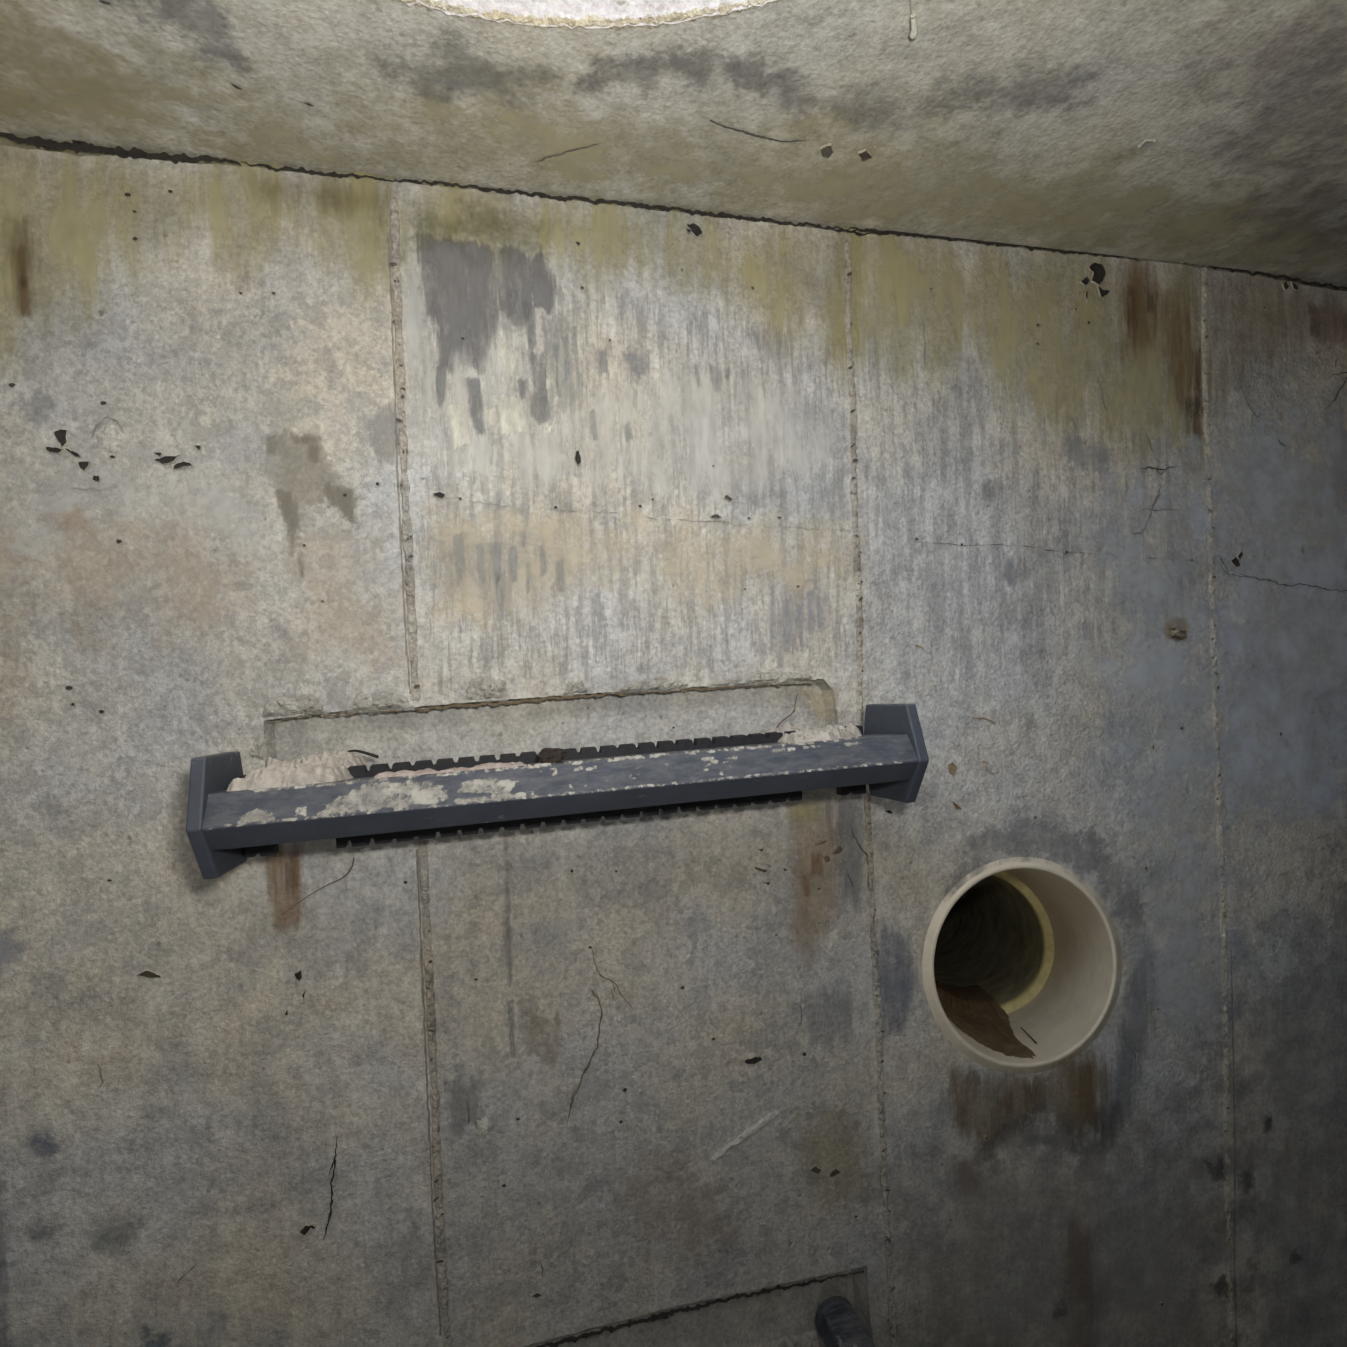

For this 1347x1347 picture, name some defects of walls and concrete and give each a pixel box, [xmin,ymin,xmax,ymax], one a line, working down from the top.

crack [0,132,1138,261]
crack [1176,262,1347,290]
leakage [418,235,553,434]
crack [1326,359,1347,410]
leakage [266,434,356,547]
crack [567,950,633,1123]
crack [323,1137,337,1240]